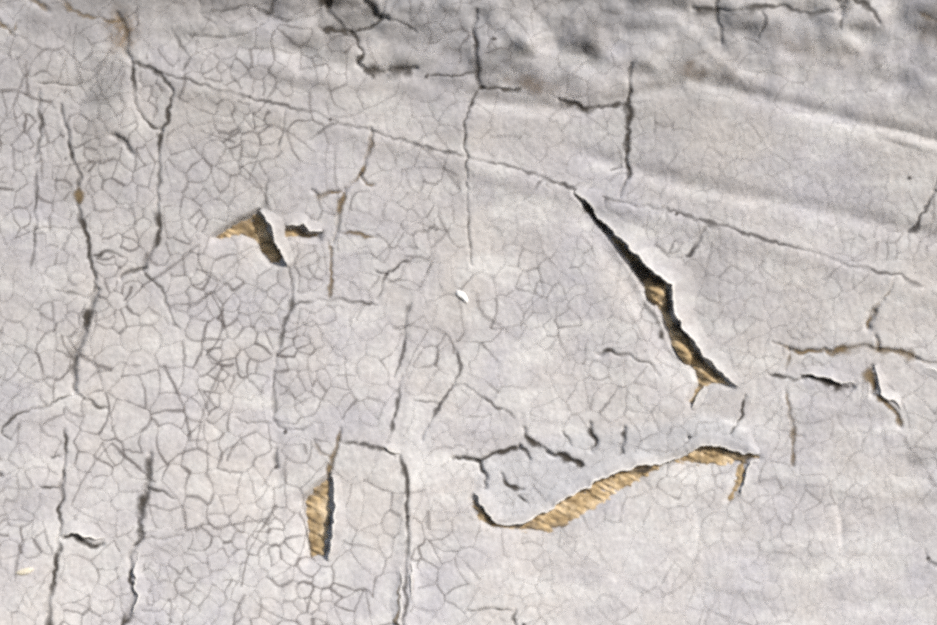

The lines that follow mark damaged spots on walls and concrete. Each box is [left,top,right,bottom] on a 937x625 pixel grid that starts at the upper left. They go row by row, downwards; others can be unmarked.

crack [854,0,877,18]
crack [319,0,520,185]
crack [565,66,634,183]
crack [0,25,332,625]
peeling [216,208,323,267]
crack [289,165,374,295]
peeling [575,187,743,410]
crack [669,210,797,248]
crack [771,317,937,425]
peeling [305,474,349,561]
crack [205,347,462,625]
peeling [454,399,760,533]